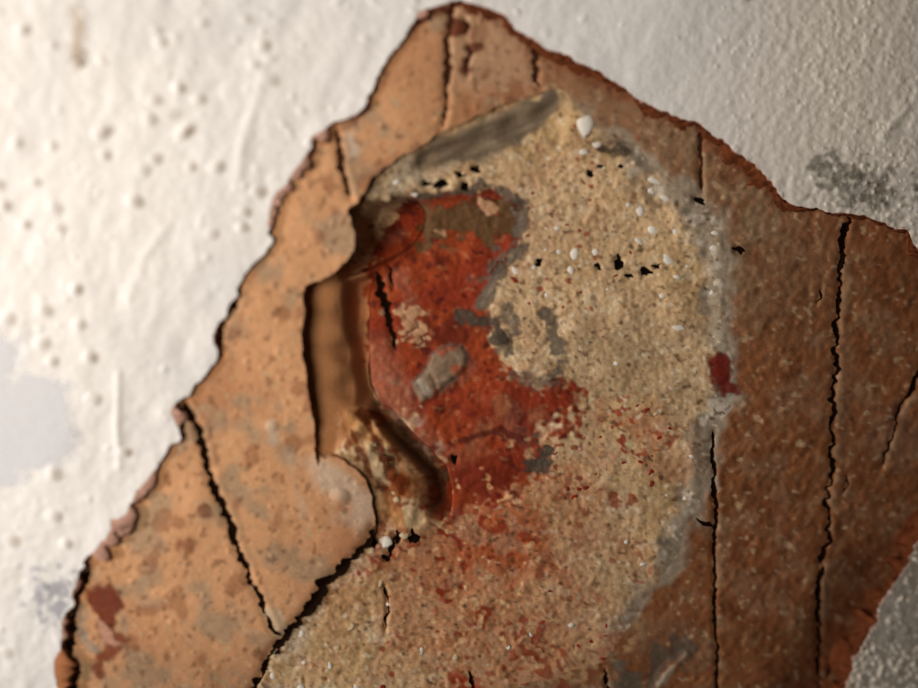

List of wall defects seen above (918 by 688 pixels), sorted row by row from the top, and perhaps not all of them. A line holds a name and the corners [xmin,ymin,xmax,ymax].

flaking render [633,96,918,260]
flaking render [54,0,629,688]
spalling [257,89,738,688]
crack [695,429,719,688]
crack [814,216,851,688]
flaking render [828,509,918,688]
crack [882,370,918,466]